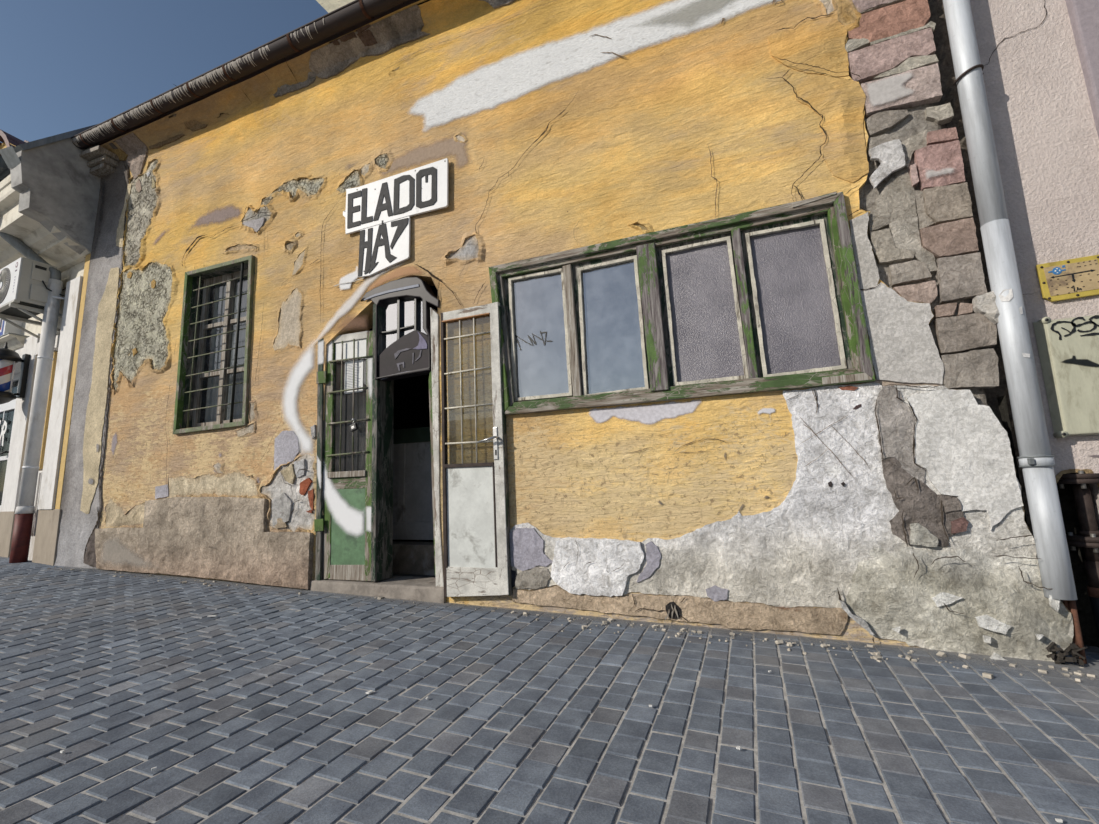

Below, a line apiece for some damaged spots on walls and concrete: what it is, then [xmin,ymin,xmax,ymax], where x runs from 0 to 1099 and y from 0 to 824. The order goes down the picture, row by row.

spalling [273,0,431,98]
spalling [479,0,516,9]
crack [984,0,1047,66]
crack [767,56,861,201]
spalling [222,149,395,255]
crack [415,92,578,307]
spalling [80,120,208,568]
peeling [272,230,309,352]
spalling [613,0,1099,662]
peeling [234,401,259,439]
spalling [165,425,323,537]
spalling [510,523,607,590]